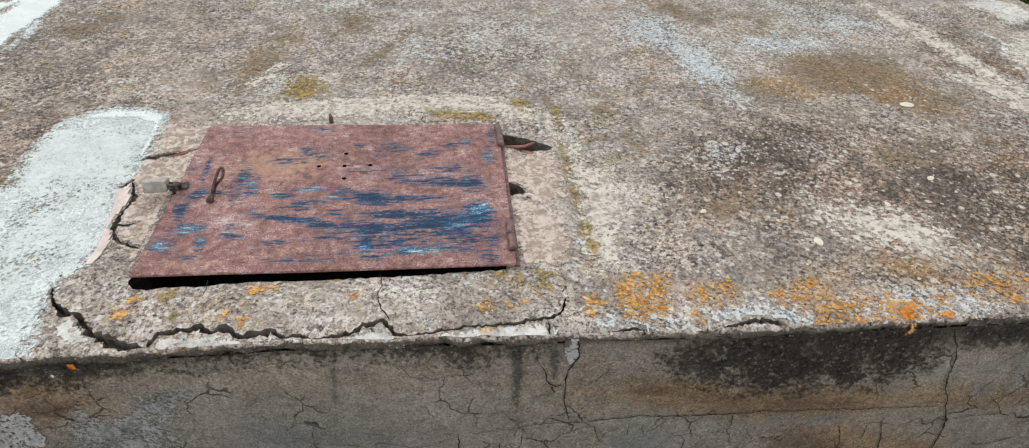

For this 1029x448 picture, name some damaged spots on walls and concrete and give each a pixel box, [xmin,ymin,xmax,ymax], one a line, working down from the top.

crack [49,272,1029,448]
damp [585,287,1029,400]